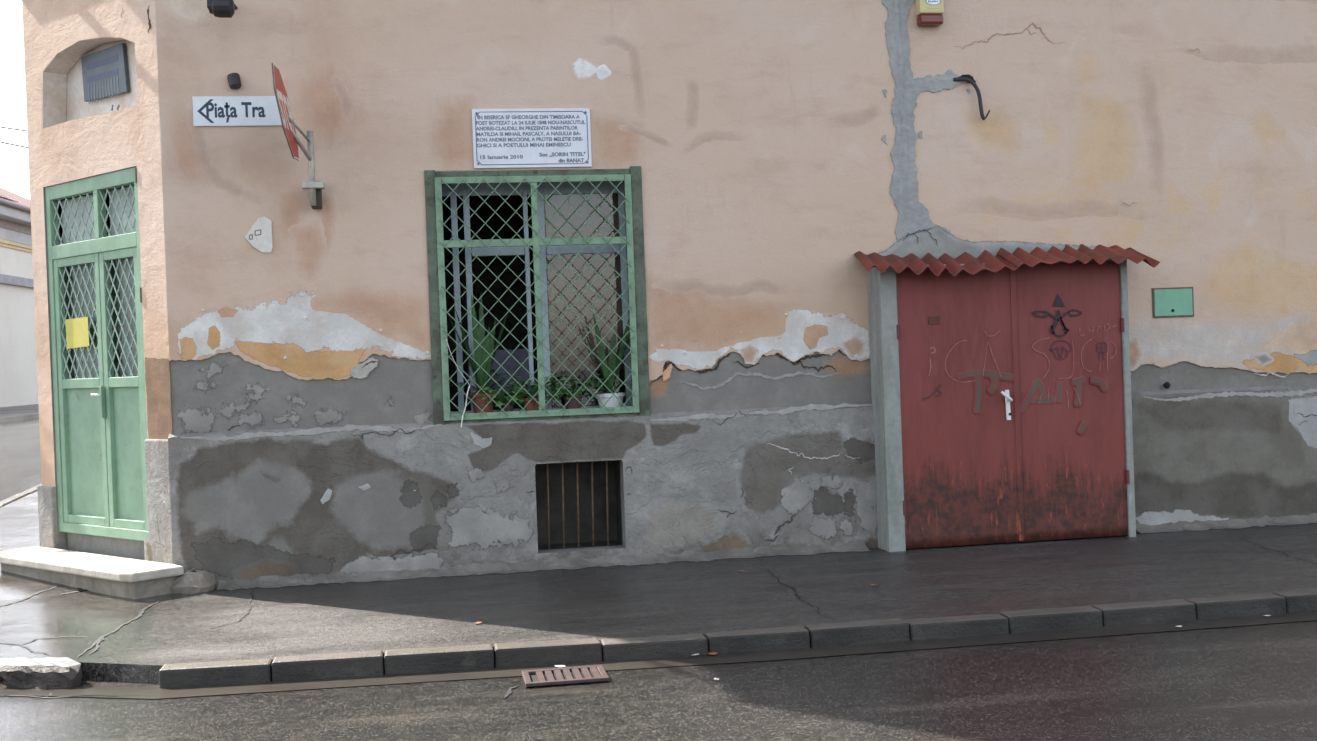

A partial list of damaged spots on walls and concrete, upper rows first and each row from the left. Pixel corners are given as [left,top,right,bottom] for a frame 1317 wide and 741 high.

crack [955,23,1064,49]
spalling [145,291,441,441]
spalling [648,309,873,422]
peeling [1129,310,1317,401]
spalling [340,467,534,574]
spalling [781,475,878,542]